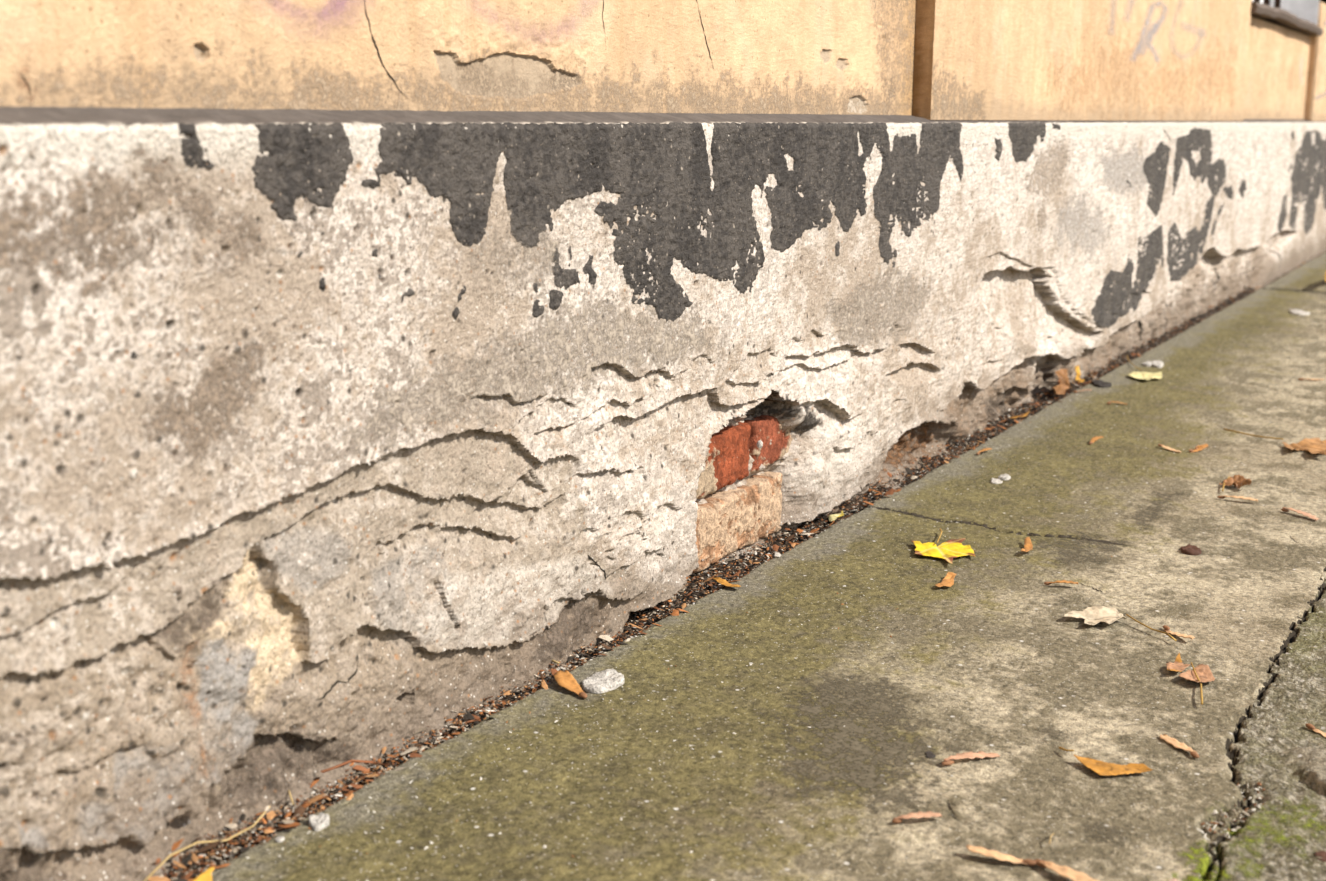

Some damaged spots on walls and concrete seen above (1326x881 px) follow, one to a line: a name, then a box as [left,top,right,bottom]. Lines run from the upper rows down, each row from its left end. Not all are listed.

crack [365,7,405,96]
flaking render [433,50,580,98]
peeling [178,123,215,169]
peeling [251,95,964,322]
crack [1210,250,1326,294]
flaking render [851,122,1326,500]
crack [868,506,1131,546]
flaking render [0,344,886,881]
crack [1199,567,1326,881]
spalling [1283,747,1326,793]
spalling [1196,777,1265,847]